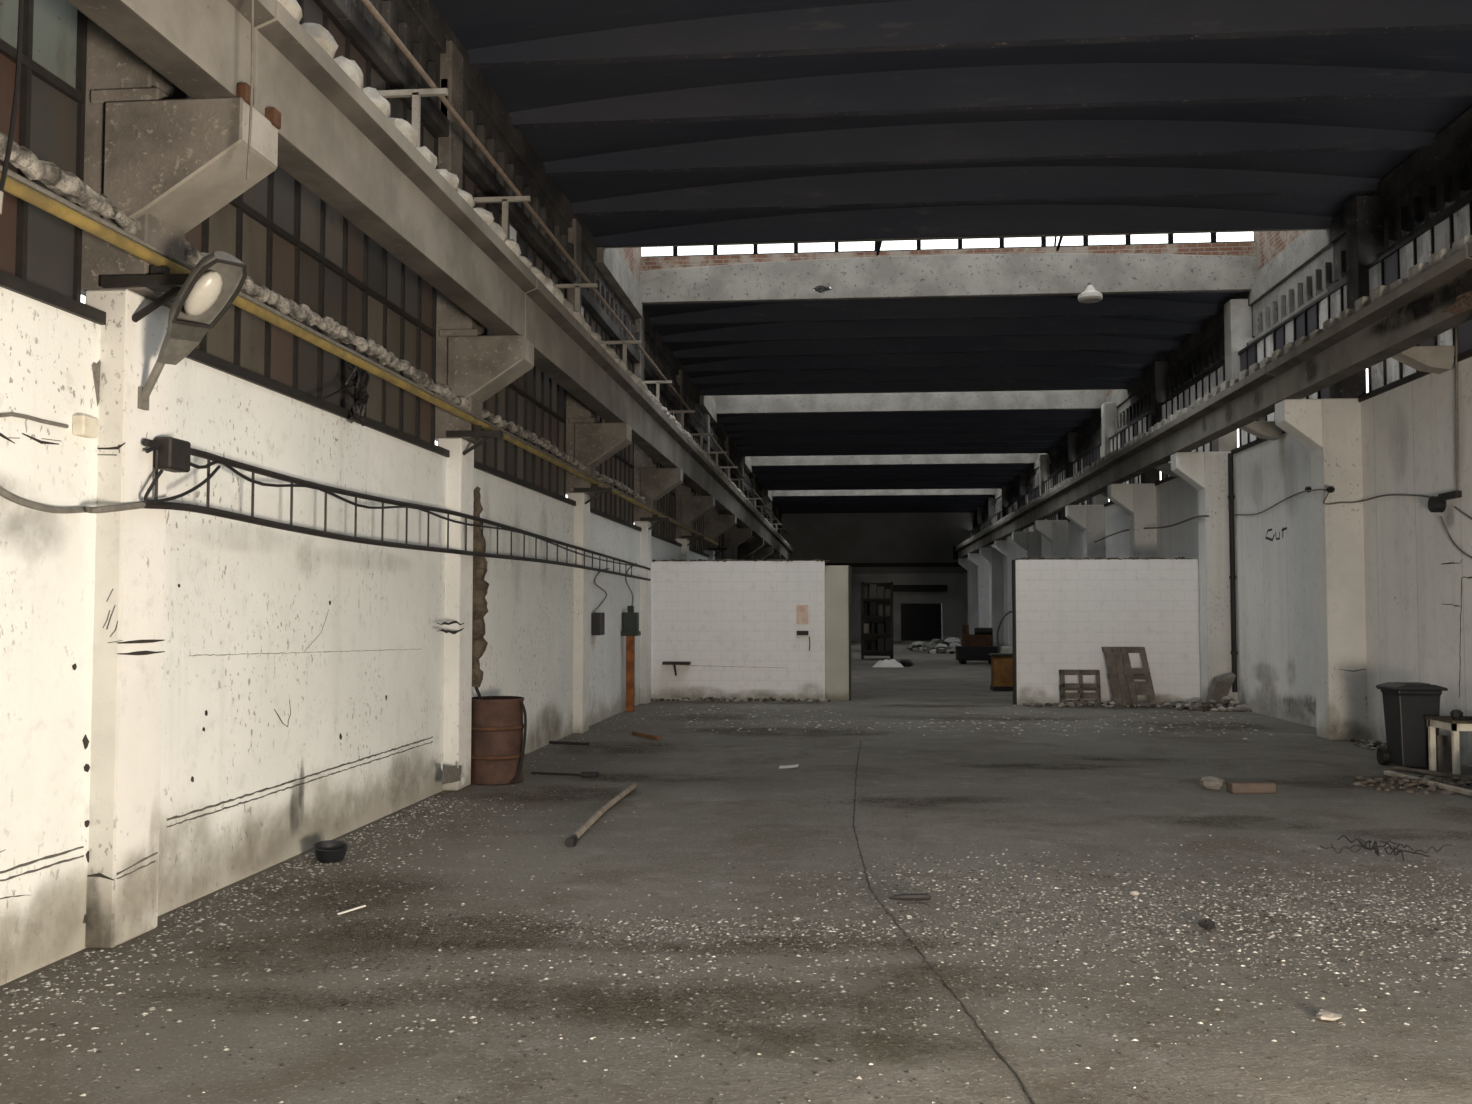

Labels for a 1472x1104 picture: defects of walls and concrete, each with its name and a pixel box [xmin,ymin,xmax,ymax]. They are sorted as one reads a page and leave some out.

damp [291,783,304,824]